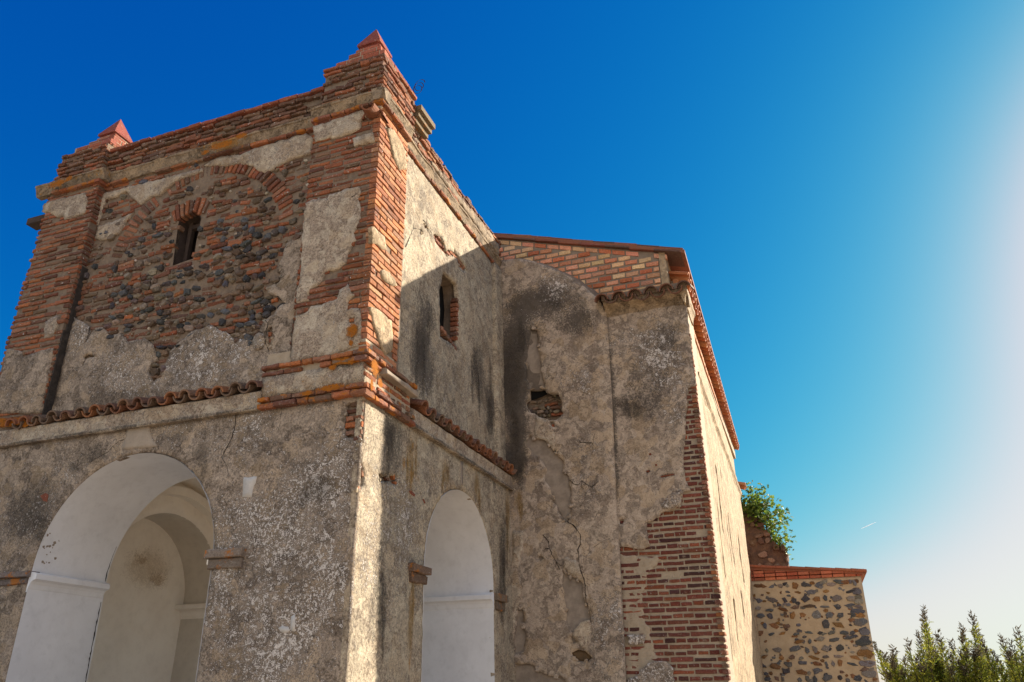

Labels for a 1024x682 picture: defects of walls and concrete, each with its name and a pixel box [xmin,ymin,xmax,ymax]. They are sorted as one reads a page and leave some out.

spalling [0,110,407,414]
peeling [525,362,573,522]
crack [543,480,605,606]
spalling [620,333,731,682]
peeling [570,650,592,664]